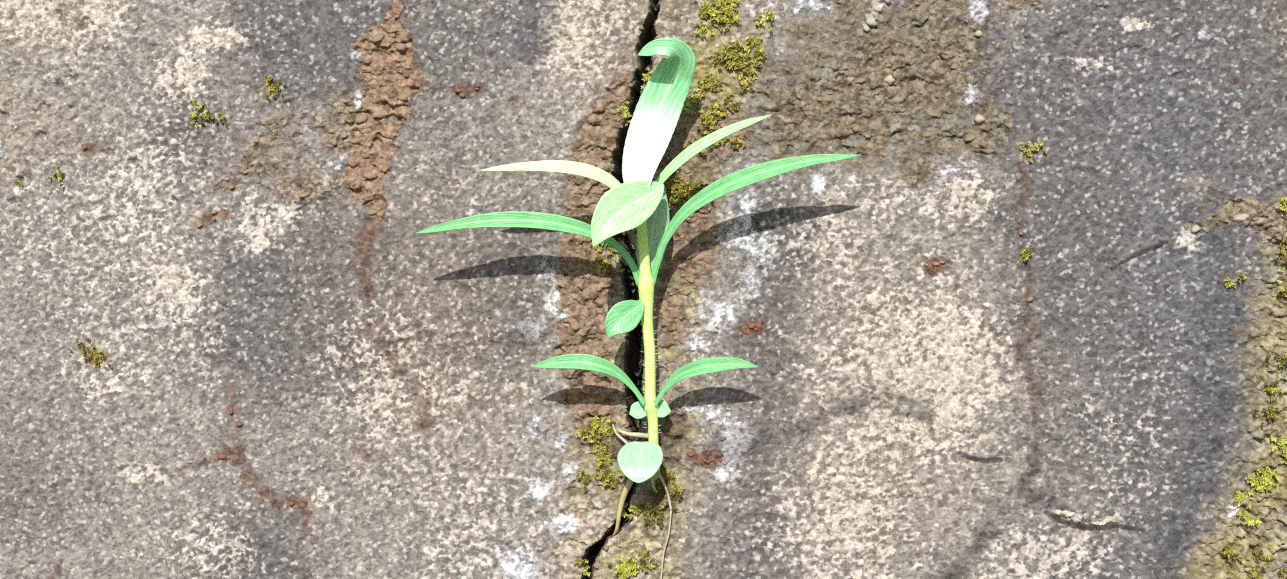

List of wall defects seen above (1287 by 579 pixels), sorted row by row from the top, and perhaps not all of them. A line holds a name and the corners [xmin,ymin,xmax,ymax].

crack [610,0,662,189]
corrosion [357,210,385,300]
corrosion [366,324,437,432]
crack [612,231,645,442]
corrosion [180,444,311,531]
crack [581,482,638,579]
leakage [1227,504,1240,518]